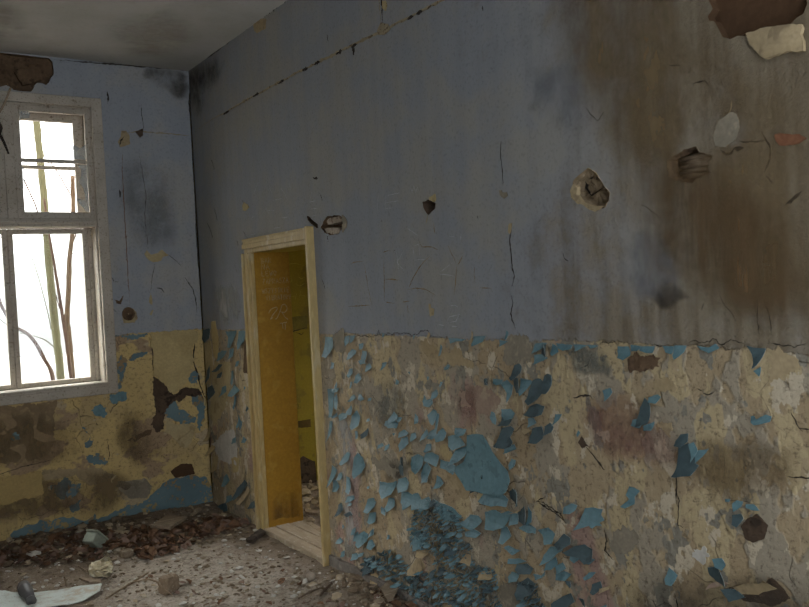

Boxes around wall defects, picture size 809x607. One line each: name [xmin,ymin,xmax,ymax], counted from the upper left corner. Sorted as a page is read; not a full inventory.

spalling [708,0,807,39]
spalling [0,53,54,92]
spalling [667,146,712,183]
spalling [570,168,610,212]
spalling [307,215,343,235]
crack [508,233,516,329]
peeling [617,345,686,373]
peeling [10,328,255,538]
peeling [671,433,708,478]
damp [0,481,71,517]
peeling [326,364,610,607]
peeling [692,546,777,602]